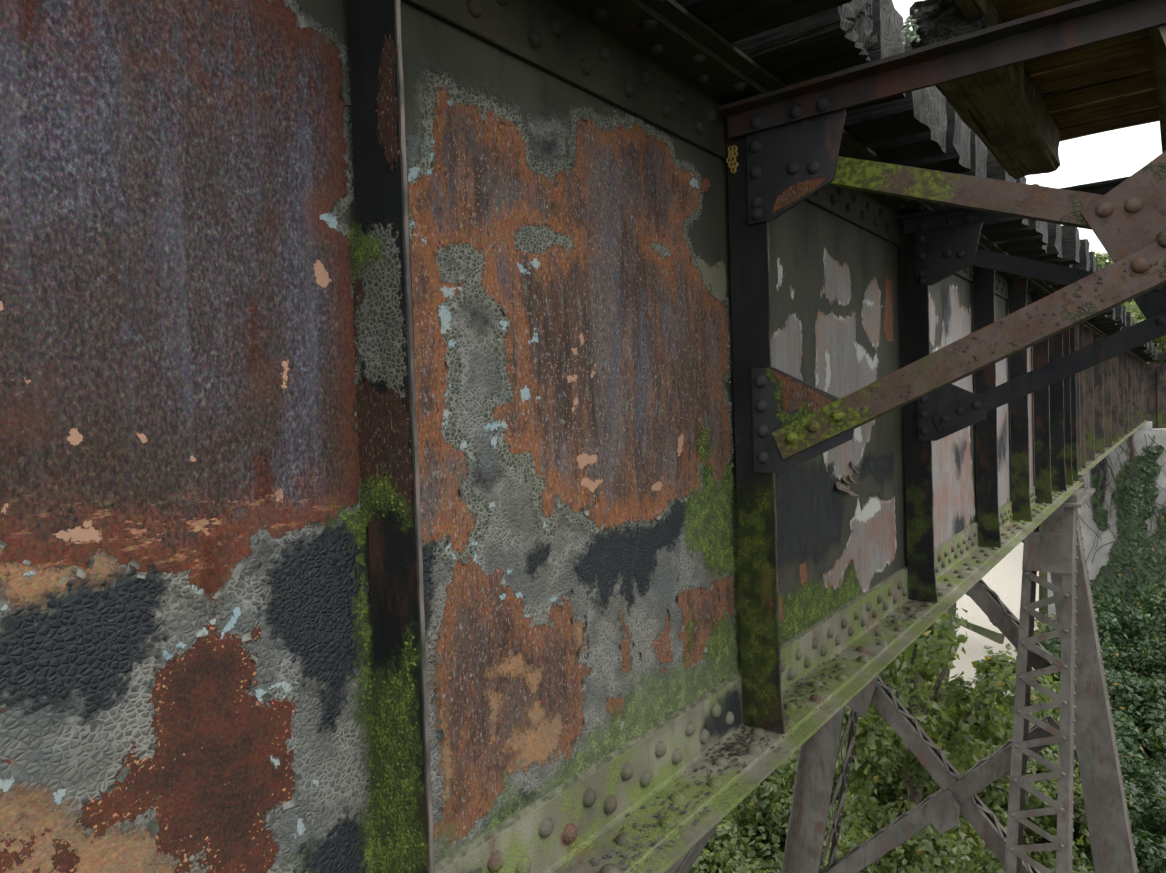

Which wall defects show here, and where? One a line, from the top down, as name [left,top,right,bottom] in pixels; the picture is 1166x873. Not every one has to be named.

peeling [320,213,340,231]
corrosion [771,176,827,213]
peeling [437,285,465,348]
peeling [771,246,883,398]
corrosion [883,278,894,342]
peeling [929,285,973,354]
corrosion [771,370,835,413]
peeling [952,374,973,393]
corrosion [0,0,734,873]
peeling [823,420,897,592]
peeling [932,426,976,548]
peeling [162,606,241,661]